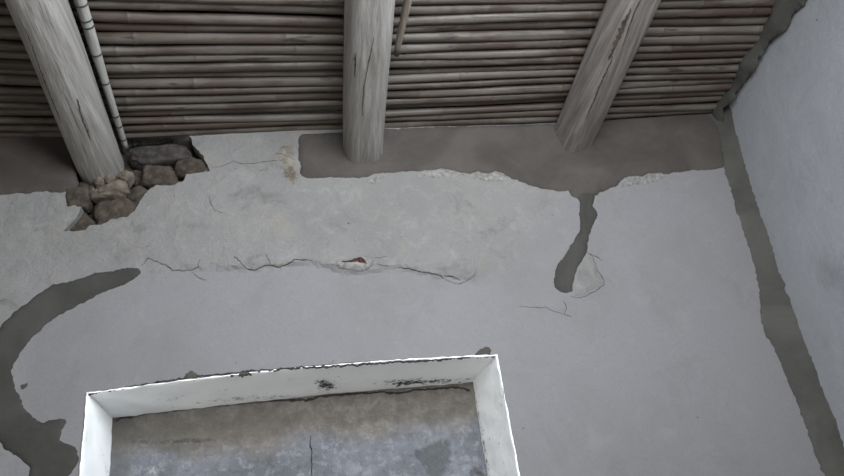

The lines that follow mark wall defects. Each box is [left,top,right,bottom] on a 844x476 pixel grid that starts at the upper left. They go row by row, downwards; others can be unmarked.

flaking render [65,142,209,231]
crack [142,258,207,281]
crack [235,254,477,284]